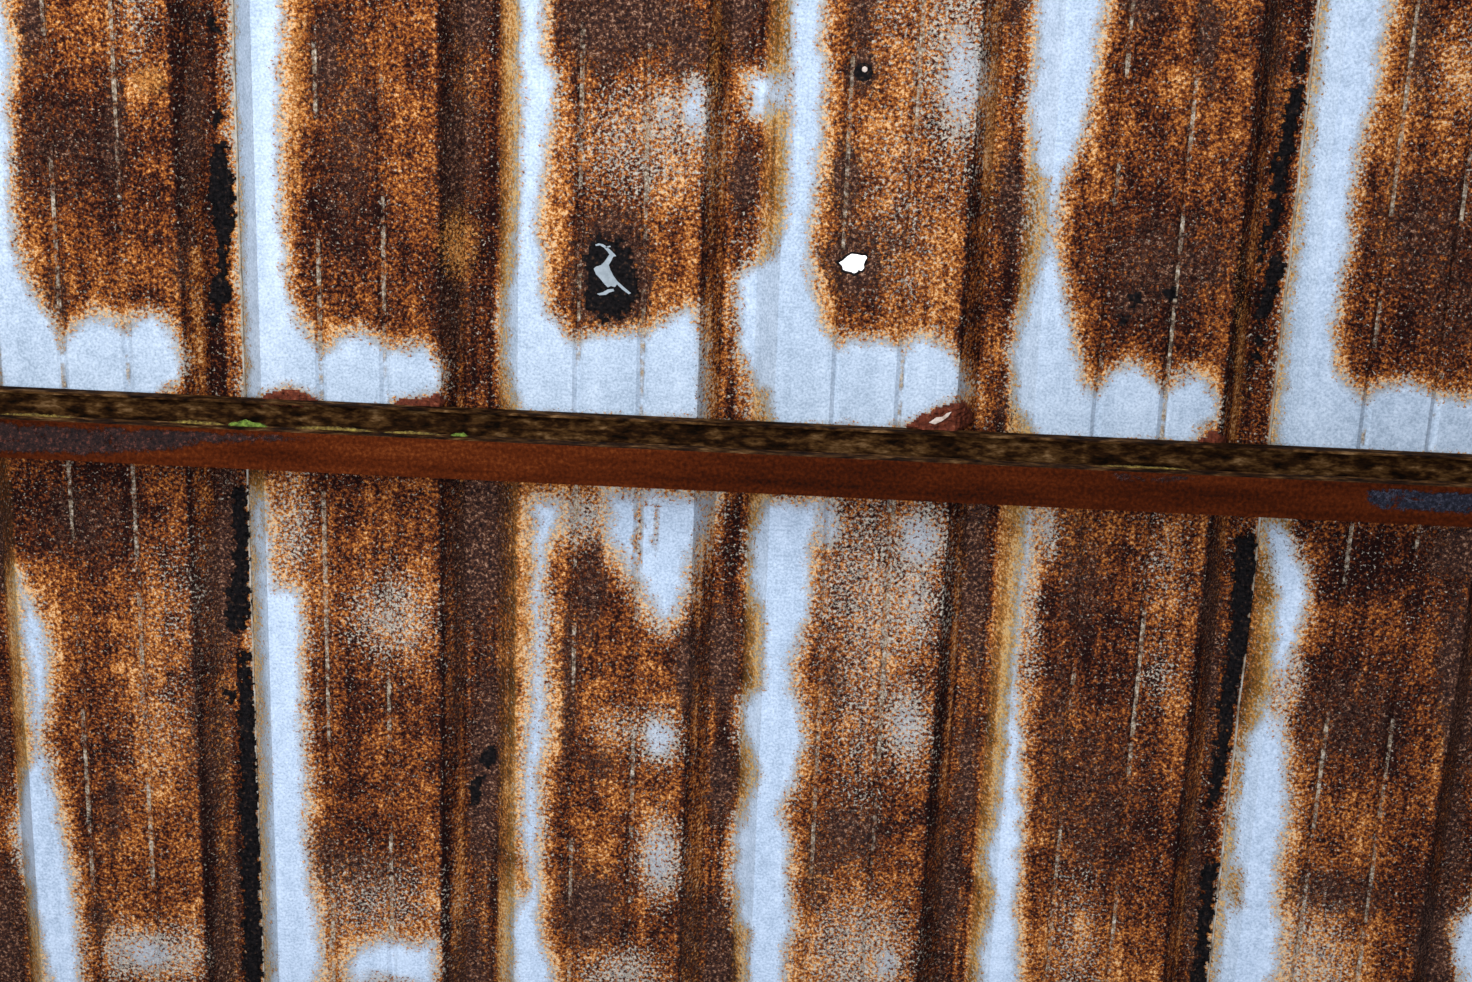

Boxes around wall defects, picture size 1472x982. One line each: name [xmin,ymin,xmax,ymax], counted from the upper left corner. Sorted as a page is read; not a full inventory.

rust [0,0,1332,445]
rust [1325,0,1472,408]
rust [0,458,1472,982]